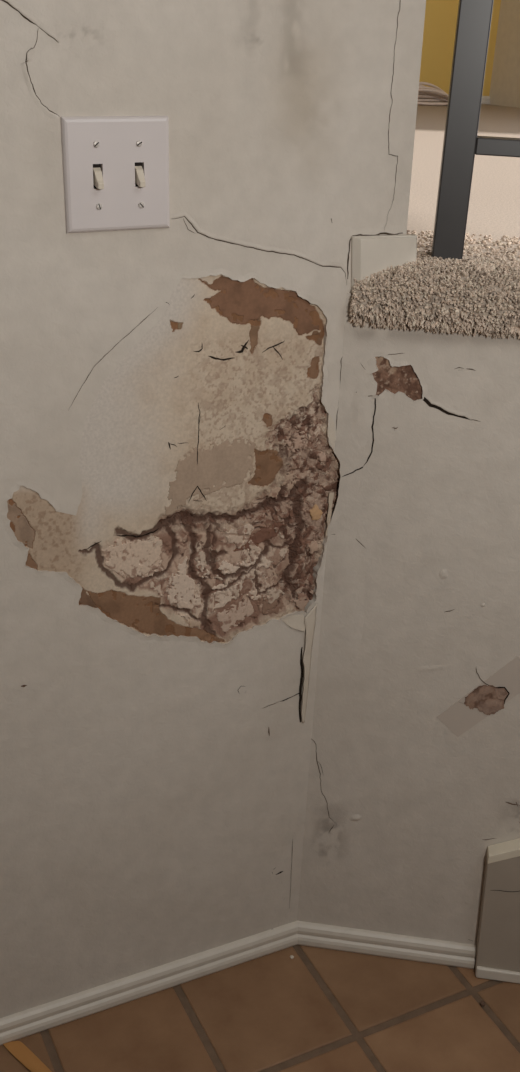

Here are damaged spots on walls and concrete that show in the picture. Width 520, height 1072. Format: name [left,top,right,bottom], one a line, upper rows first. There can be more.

crack [2,0,62,121]
crack [171,0,401,285]
flaking render [1,268,480,723]
peeling [460,669,510,715]
crack [313,740,334,832]